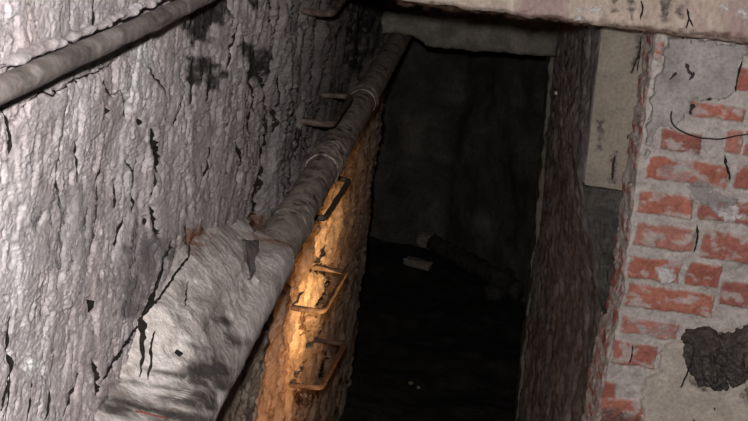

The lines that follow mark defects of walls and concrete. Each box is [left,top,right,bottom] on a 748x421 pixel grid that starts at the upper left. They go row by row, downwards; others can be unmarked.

crack [734,59,743,92]
crack [1,108,12,154]
crack [723,155,731,180]
peeling [242,239,259,278]
crack [692,226,700,252]
crack [100,226,192,383]